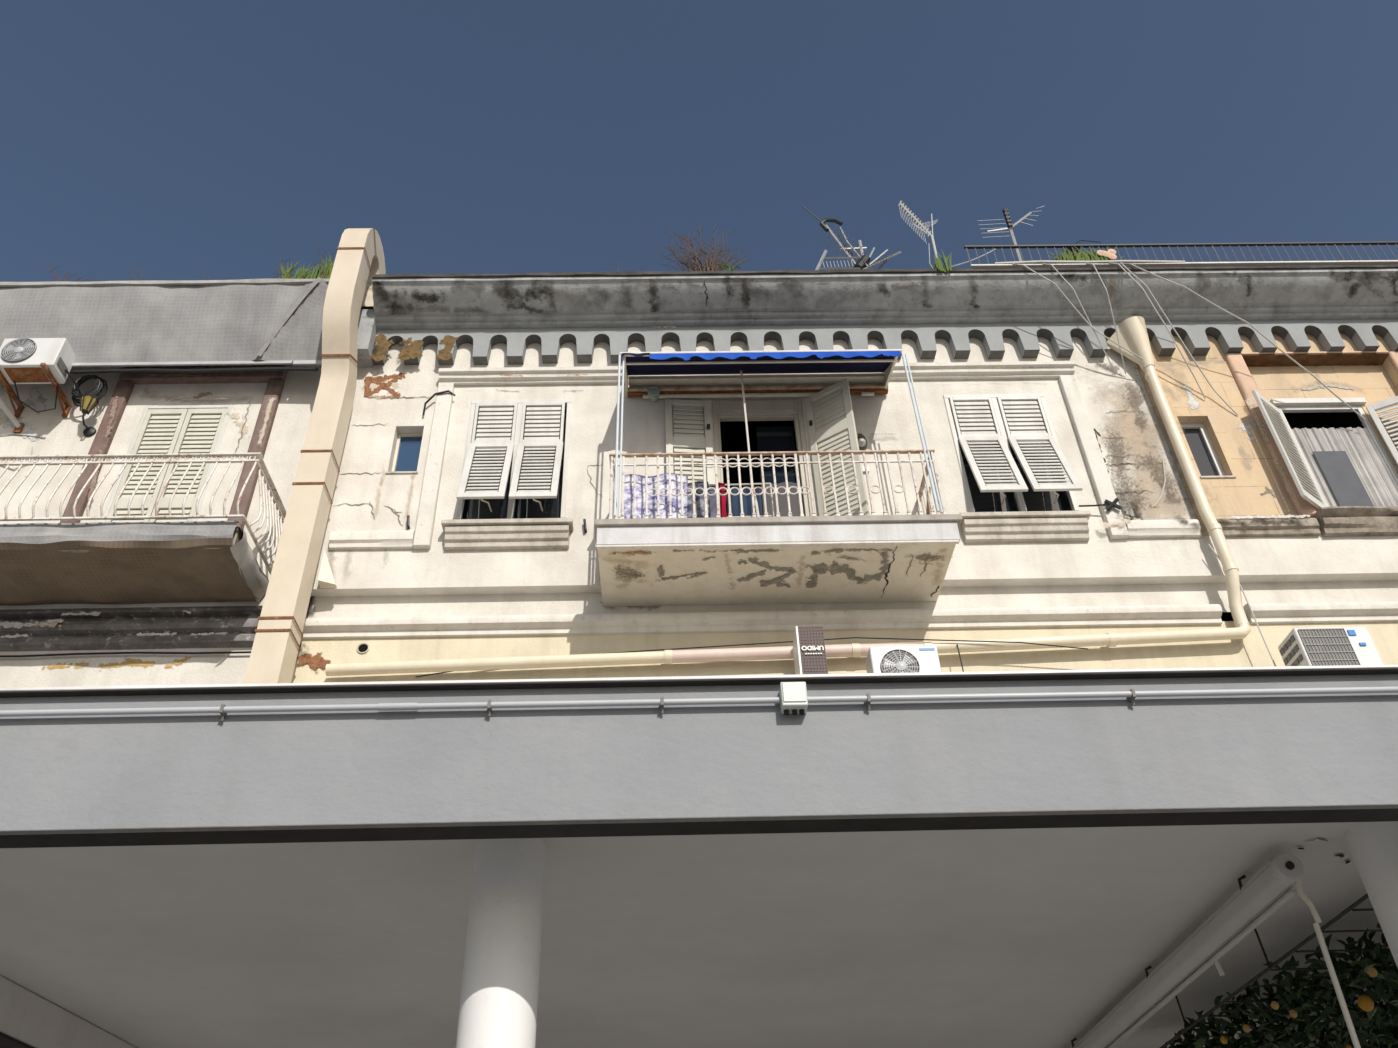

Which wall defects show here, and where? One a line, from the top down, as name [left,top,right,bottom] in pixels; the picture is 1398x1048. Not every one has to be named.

leakage [367,281,481,314]
leakage [457,282,555,313]
leakage [1333,271,1398,303]
spalling [362,334,459,398]
crack [351,396,429,426]
leakage [1097,363,1199,525]
crack [333,472,403,526]
leakage [1219,514,1310,526]
spalling [657,557,716,581]
spalling [736,549,891,588]
crack [881,546,939,597]
spalling [297,644,331,673]